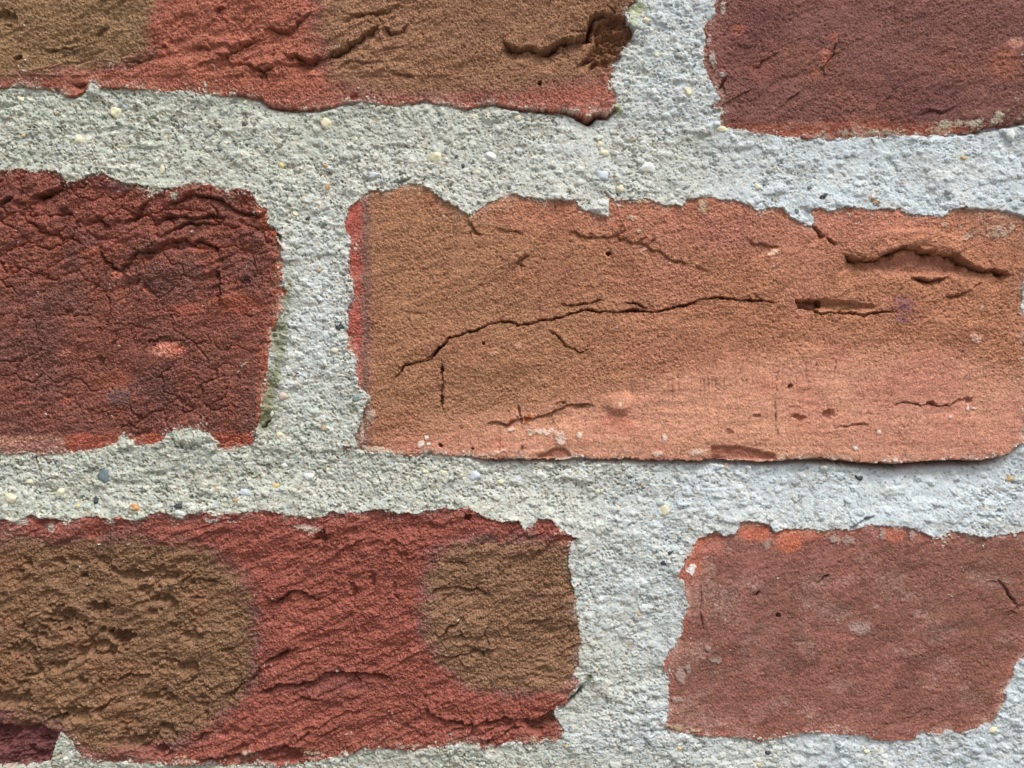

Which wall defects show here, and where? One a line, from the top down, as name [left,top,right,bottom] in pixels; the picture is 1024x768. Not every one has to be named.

crack [501,4,620,68]
crack [810,225,1014,301]
crack [394,294,893,412]
crack [486,398,597,455]